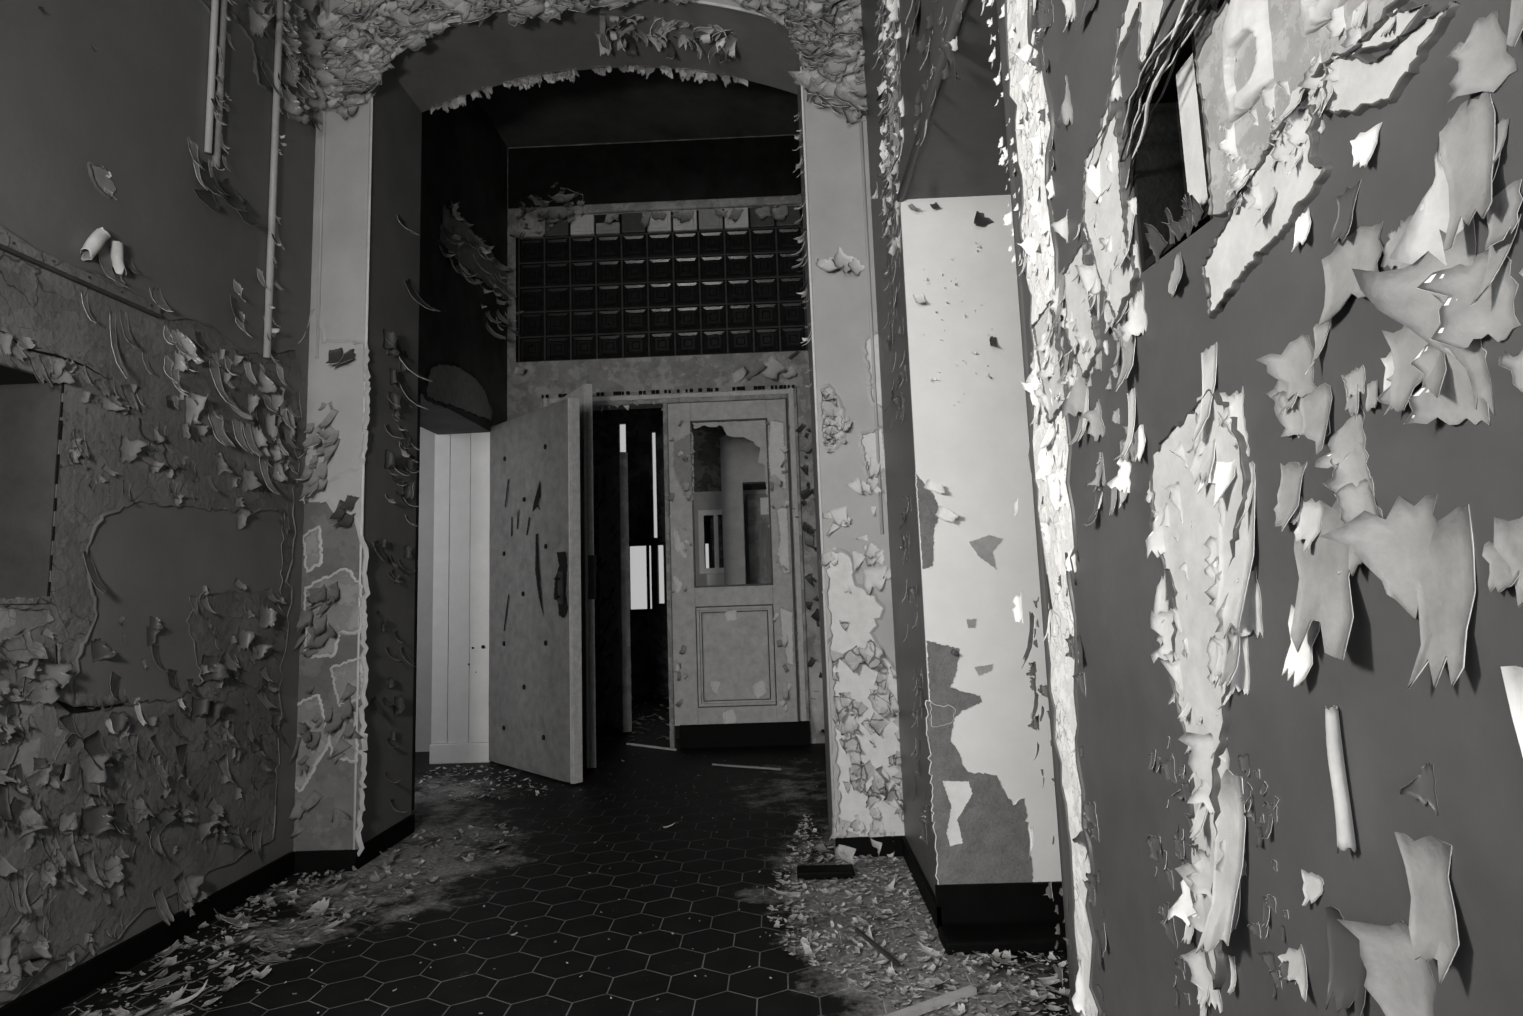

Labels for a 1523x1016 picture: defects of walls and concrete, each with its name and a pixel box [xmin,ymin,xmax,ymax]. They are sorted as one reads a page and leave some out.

peeling [199,0,748,146]
flaking render [436,200,523,339]
peeling [509,182,585,239]
peeling [641,210,694,228]
peeling [667,420,695,558]
flaking render [725,0,1296,1016]
flaking render [0,223,433,1006]
peeling [723,709,736,724]